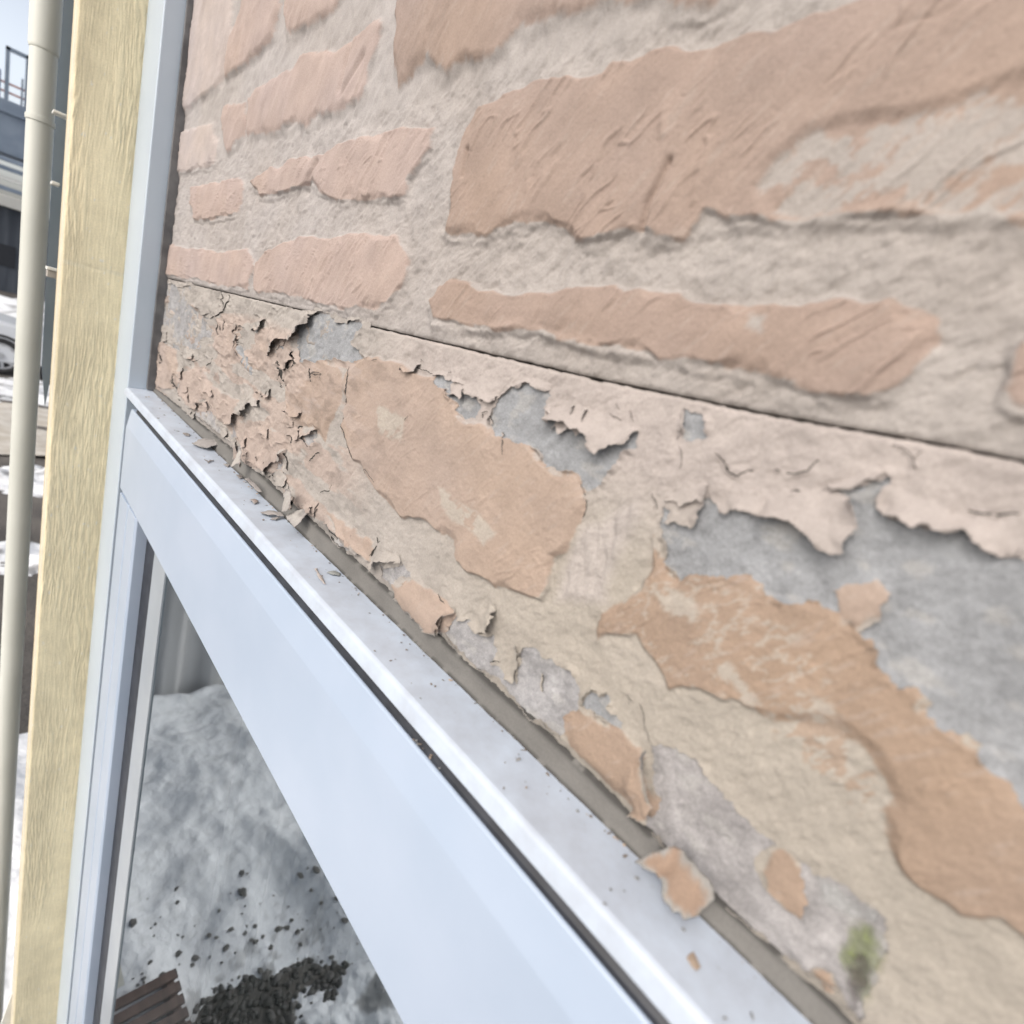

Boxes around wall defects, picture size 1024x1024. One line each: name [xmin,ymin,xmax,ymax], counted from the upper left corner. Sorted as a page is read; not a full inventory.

crack [158,291,230,401]
crack [272,355,377,509]
peeling [159,281,643,743]
peeling [654,464,1024,822]
peeling [625,739,901,1024]